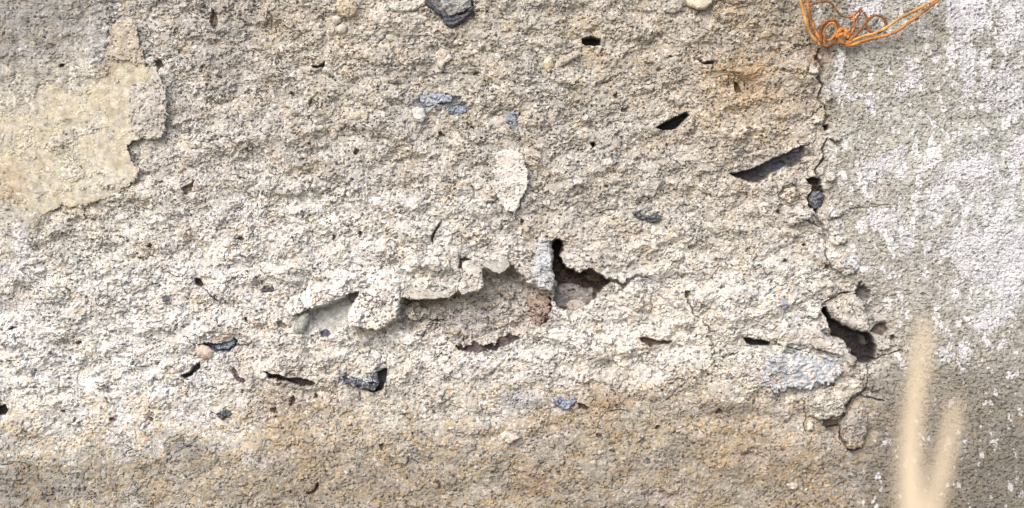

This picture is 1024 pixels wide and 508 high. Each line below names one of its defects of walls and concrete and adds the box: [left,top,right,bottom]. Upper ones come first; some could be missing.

flaking render [0,18,169,227]
crack [777,47,840,207]
crack [846,203,894,222]
peeling [274,282,361,340]
spalling [396,237,649,355]
flaking render [721,280,907,393]
crack [801,362,887,454]